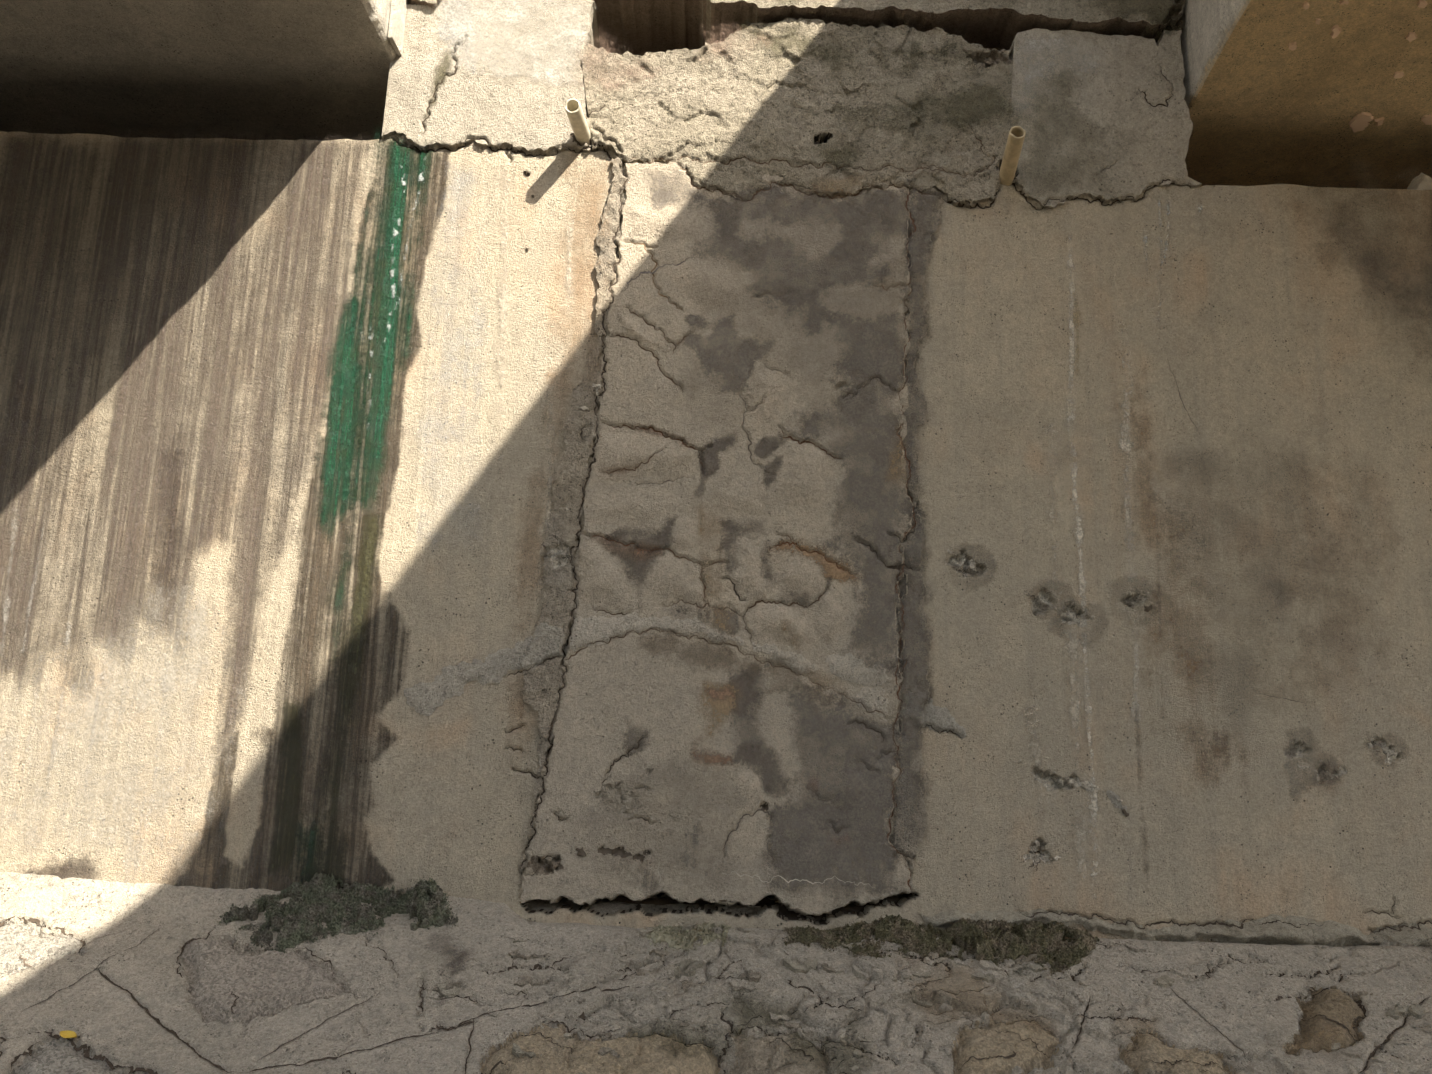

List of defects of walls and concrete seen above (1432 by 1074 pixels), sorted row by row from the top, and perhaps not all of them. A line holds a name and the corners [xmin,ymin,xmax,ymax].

spalling [962,49,1011,68]
leakage [651,178,917,676]
crack [397,42,1191,925]
leakage [0,135,449,891]
spalling [1029,584,1096,628]
leakage [729,666,900,899]
spalling [1013,759,1129,817]
spalling [526,840,651,876]
crack [0,916,85,956]
crack [1019,911,1322,935]
crack [1364,899,1432,934]
crack [0,1031,158,1074]